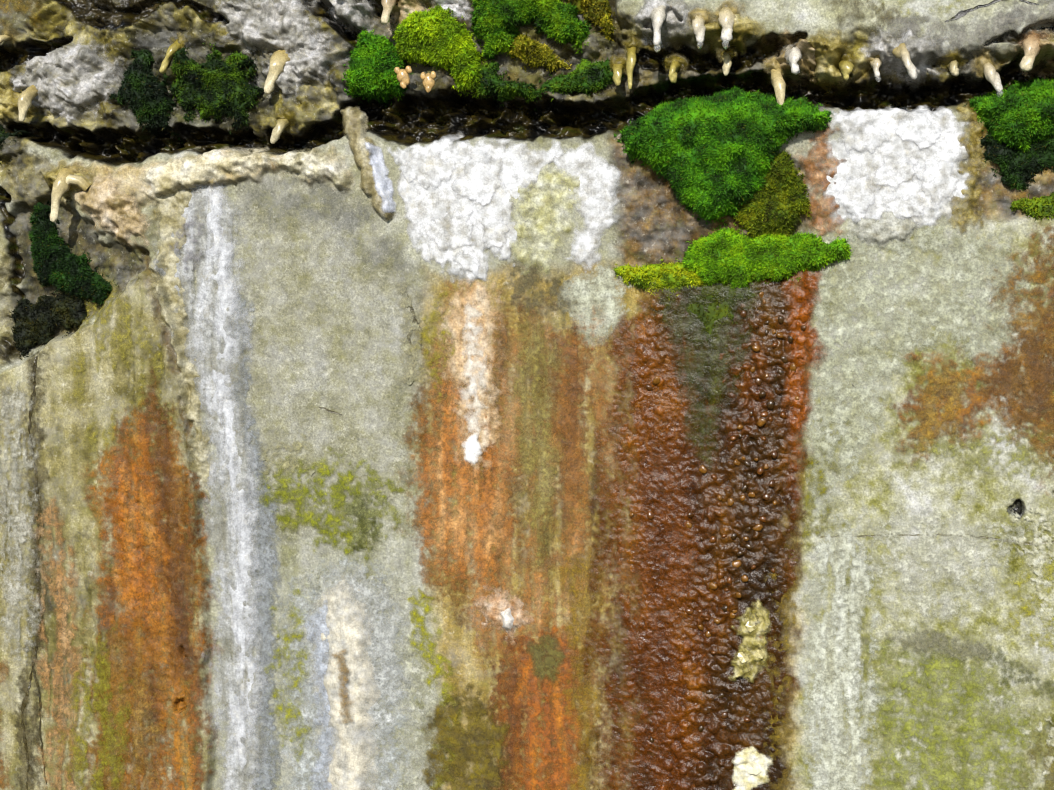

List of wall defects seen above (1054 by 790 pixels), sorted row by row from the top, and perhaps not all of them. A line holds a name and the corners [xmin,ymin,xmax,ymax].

crack [0,0,1054,165]
rust [35,369,220,790]
water stain [155,186,280,790]
rust [405,269,824,790]
rust [894,227,1054,463]